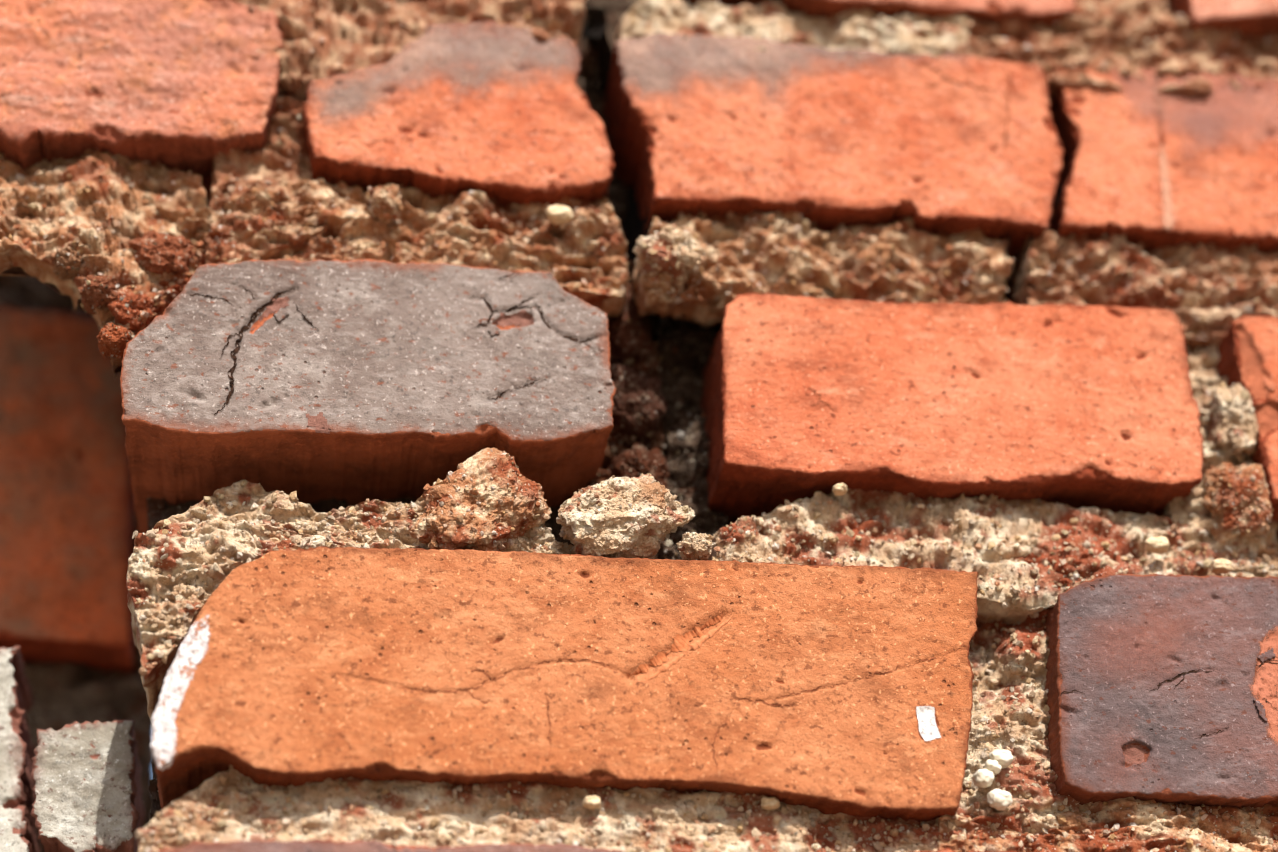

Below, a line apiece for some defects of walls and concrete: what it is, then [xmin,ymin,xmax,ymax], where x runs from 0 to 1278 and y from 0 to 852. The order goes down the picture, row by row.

crack [571,5,613,95]
crack [604,184,654,264]
crack [1004,176,1066,305]
crack [188,286,318,415]
crack [488,377,549,400]
crack [469,272,603,353]
peeling [151,714,174,759]
crack [712,647,968,768]
crack [1149,669,1212,692]
spalling [1251,627,1278,743]